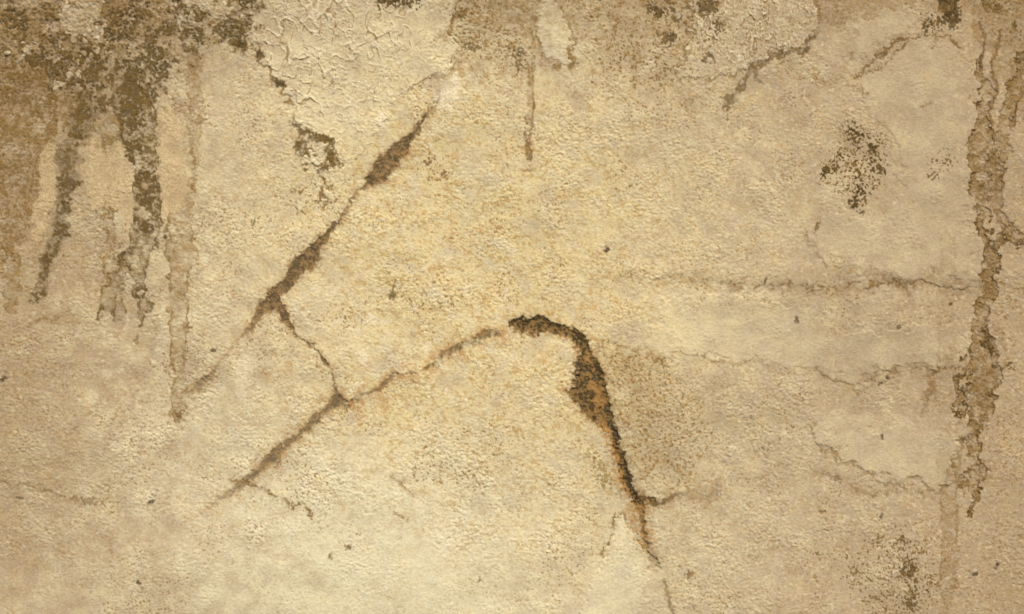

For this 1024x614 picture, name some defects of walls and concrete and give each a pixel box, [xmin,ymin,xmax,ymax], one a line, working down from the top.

leakage [0,0,265,326]
peeling [157,0,460,214]
leakage [820,121,888,210]
leakage [914,0,1021,66]
leakage [166,308,192,421]
crack [232,91,676,543]